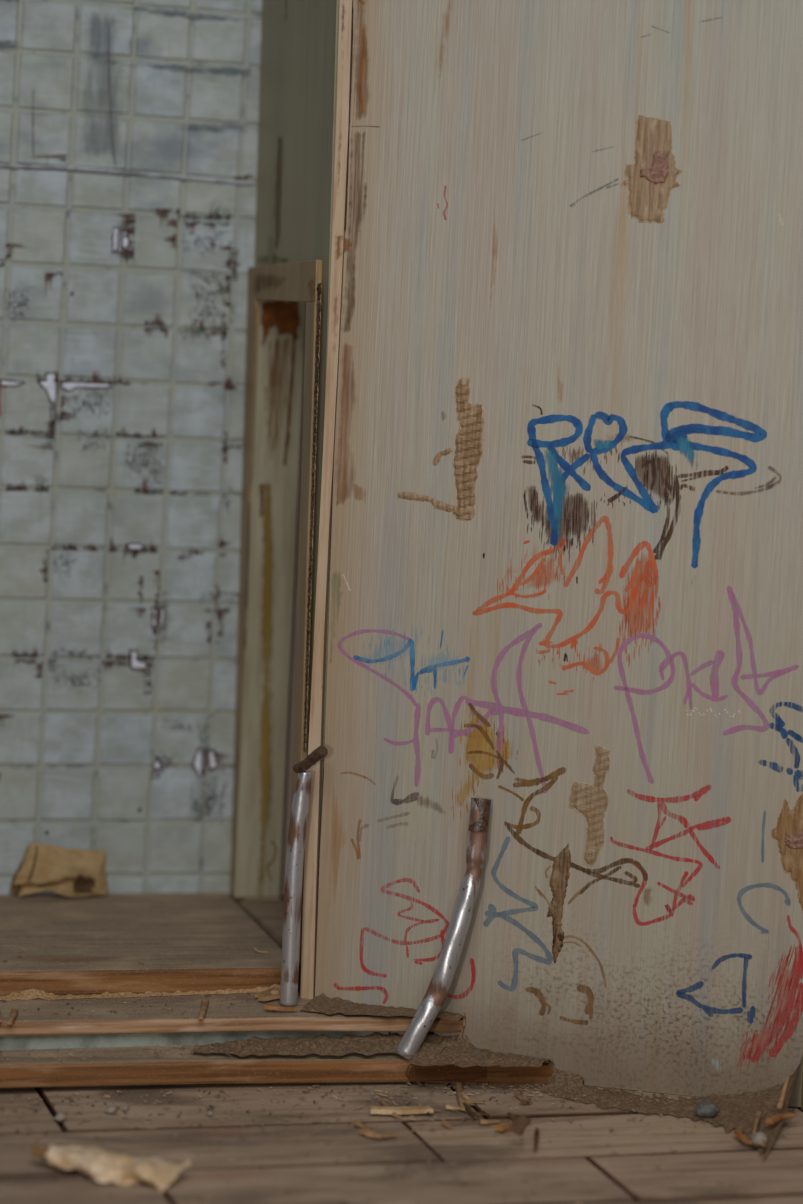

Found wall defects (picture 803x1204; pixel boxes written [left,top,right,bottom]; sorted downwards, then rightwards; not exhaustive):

spalling [111,214,135,263]
spalling [0,370,187,495]
rust [261,301,300,467]
spalling [396,377,485,521]
spalling [40,536,158,583]
spalling [11,570,173,696]
spalling [150,720,230,824]
spalling [535,745,610,988]